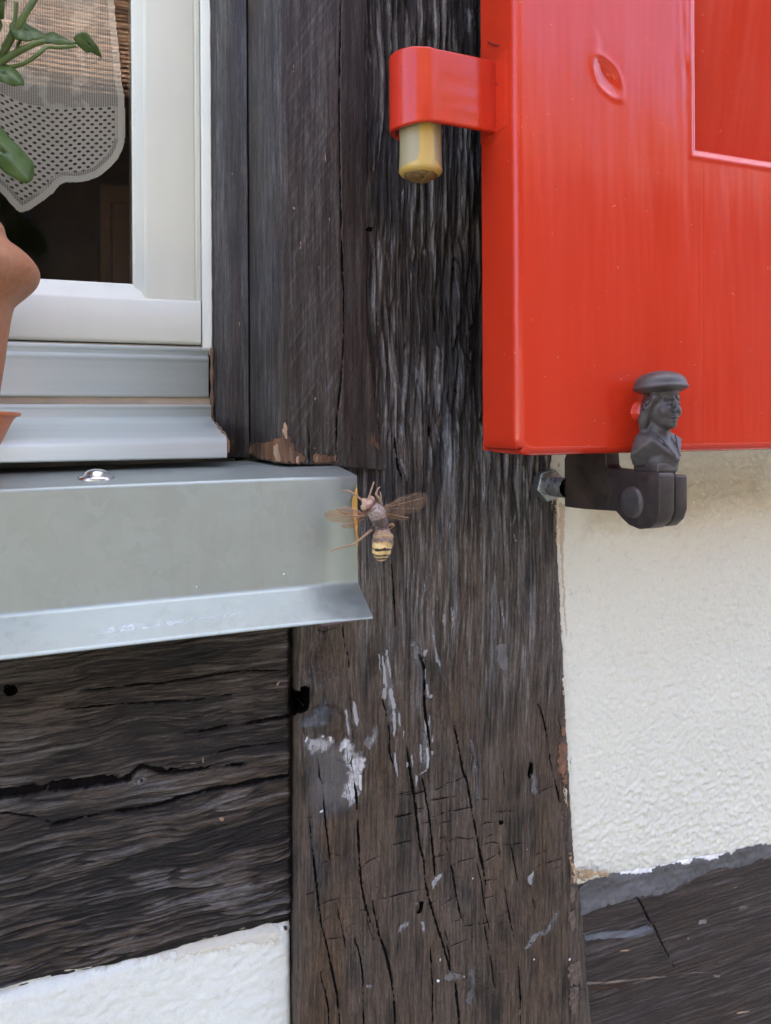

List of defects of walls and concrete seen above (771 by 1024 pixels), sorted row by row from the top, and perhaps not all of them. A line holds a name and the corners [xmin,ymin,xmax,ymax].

crack [0,669,289,824]
peeling [378,650,434,784]
crack [305,655,561,1024]